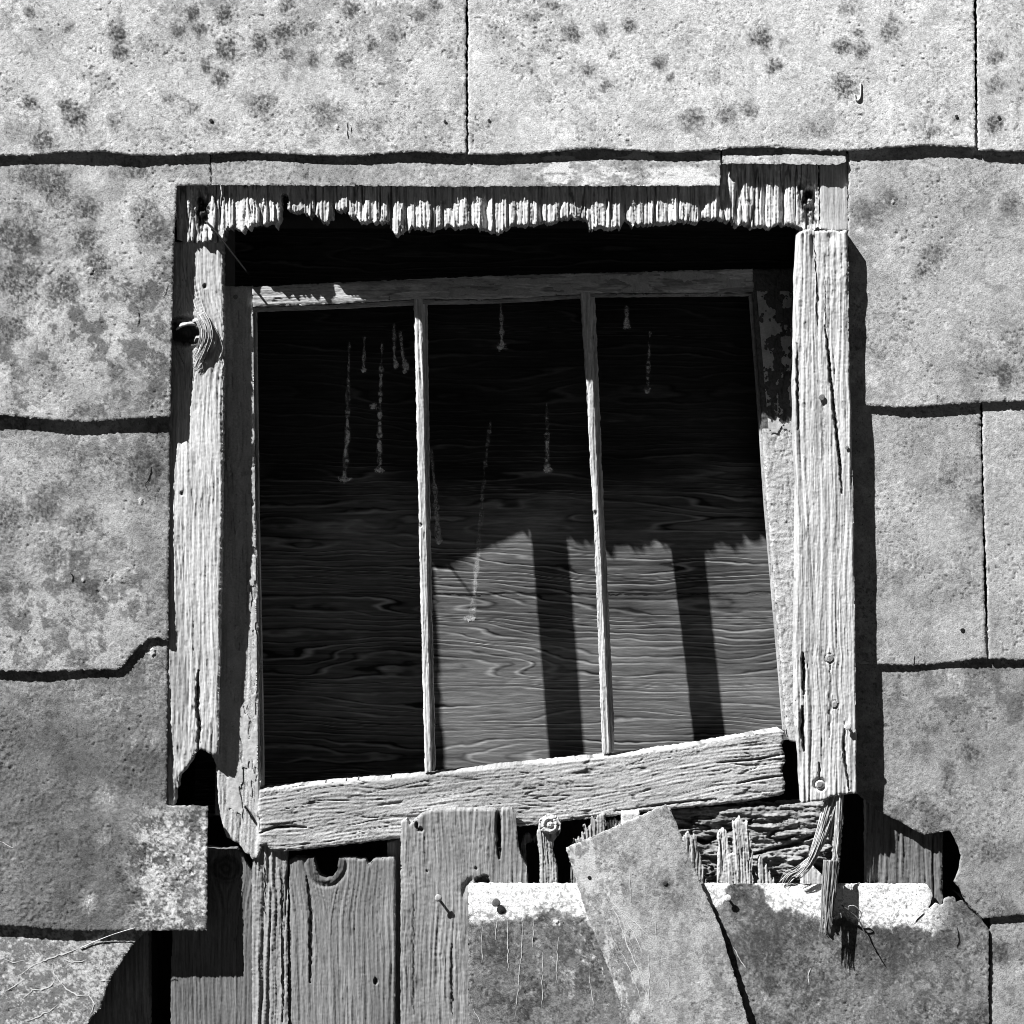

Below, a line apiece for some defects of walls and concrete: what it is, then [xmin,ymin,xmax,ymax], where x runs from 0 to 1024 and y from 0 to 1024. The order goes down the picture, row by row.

water stain [108,23,127,59]
water stain [173,6,206,35]
water stain [201,39,235,86]
water stain [253,0,313,60]
water stain [750,30,782,73]
water stain [834,72,857,99]
water stain [833,28,870,58]
water stain [58,100,87,130]
water stain [0,198,109,304]
peeling [757,291,793,433]
crack [797,239,842,487]
water stain [371,334,409,473]